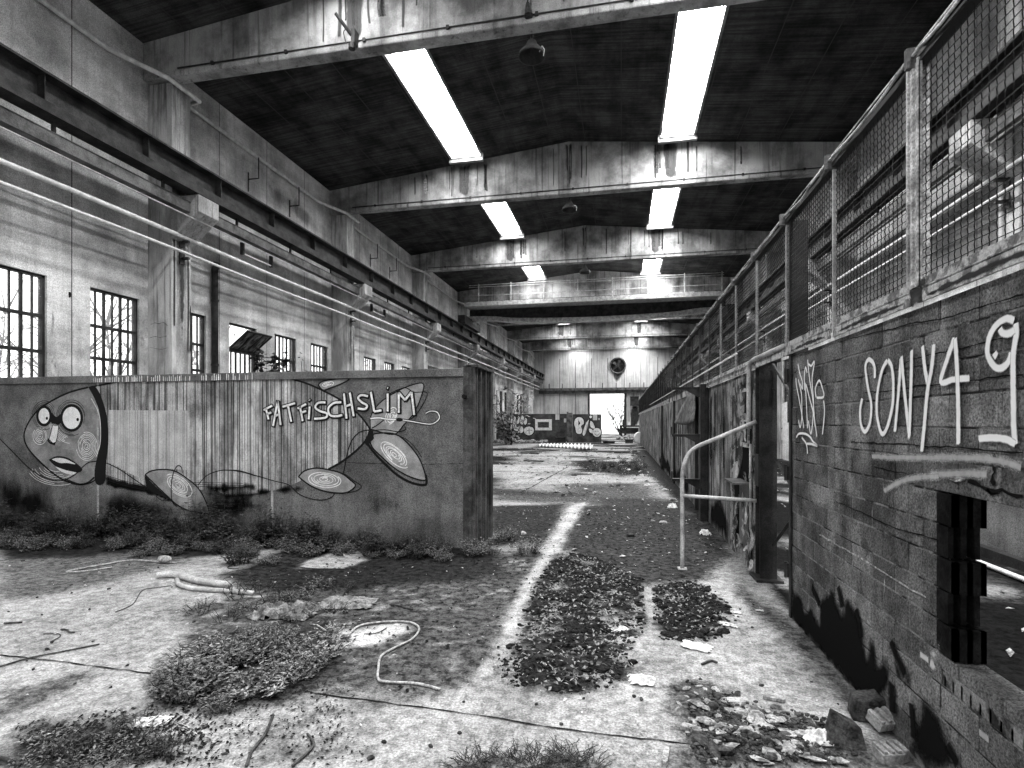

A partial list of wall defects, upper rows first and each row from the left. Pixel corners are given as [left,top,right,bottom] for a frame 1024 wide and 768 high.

water stain [449,164,488,196]
water stain [553,144,587,185]
water stain [506,240,526,261]
water stain [644,229,663,253]